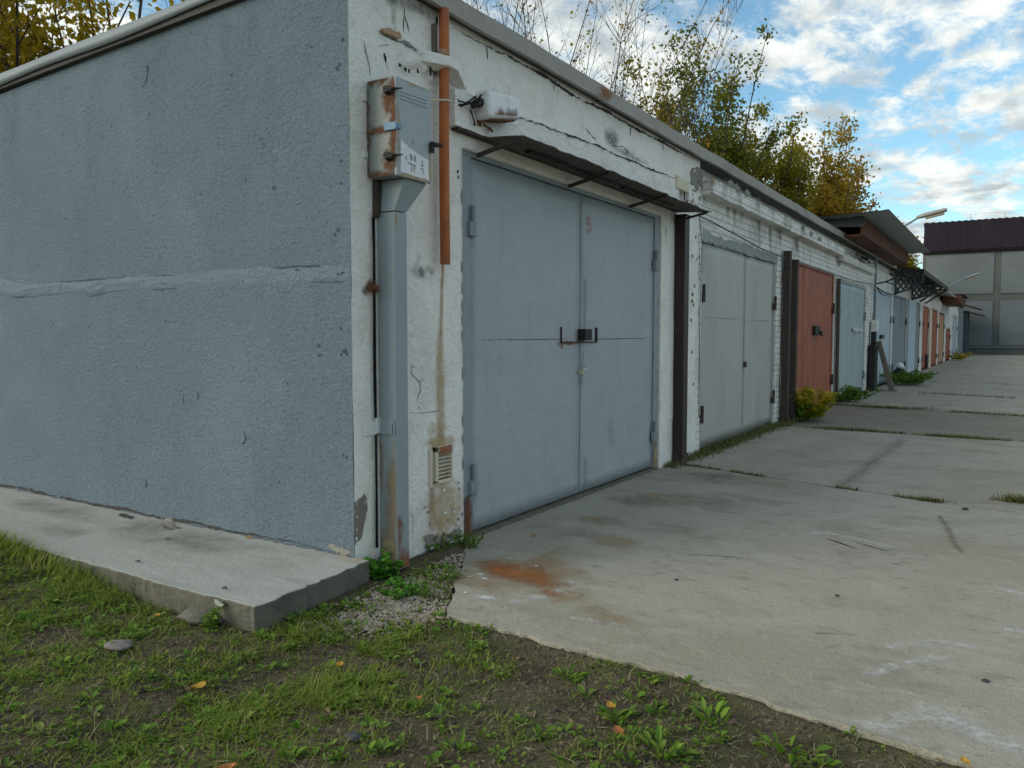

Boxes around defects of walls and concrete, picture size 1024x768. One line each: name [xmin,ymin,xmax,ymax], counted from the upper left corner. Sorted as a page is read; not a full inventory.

crack [436,15,691,178]
crack [272,264,344,283]
spalling [326,217,378,556]
rust [430,330,452,456]
rust [456,559,578,600]